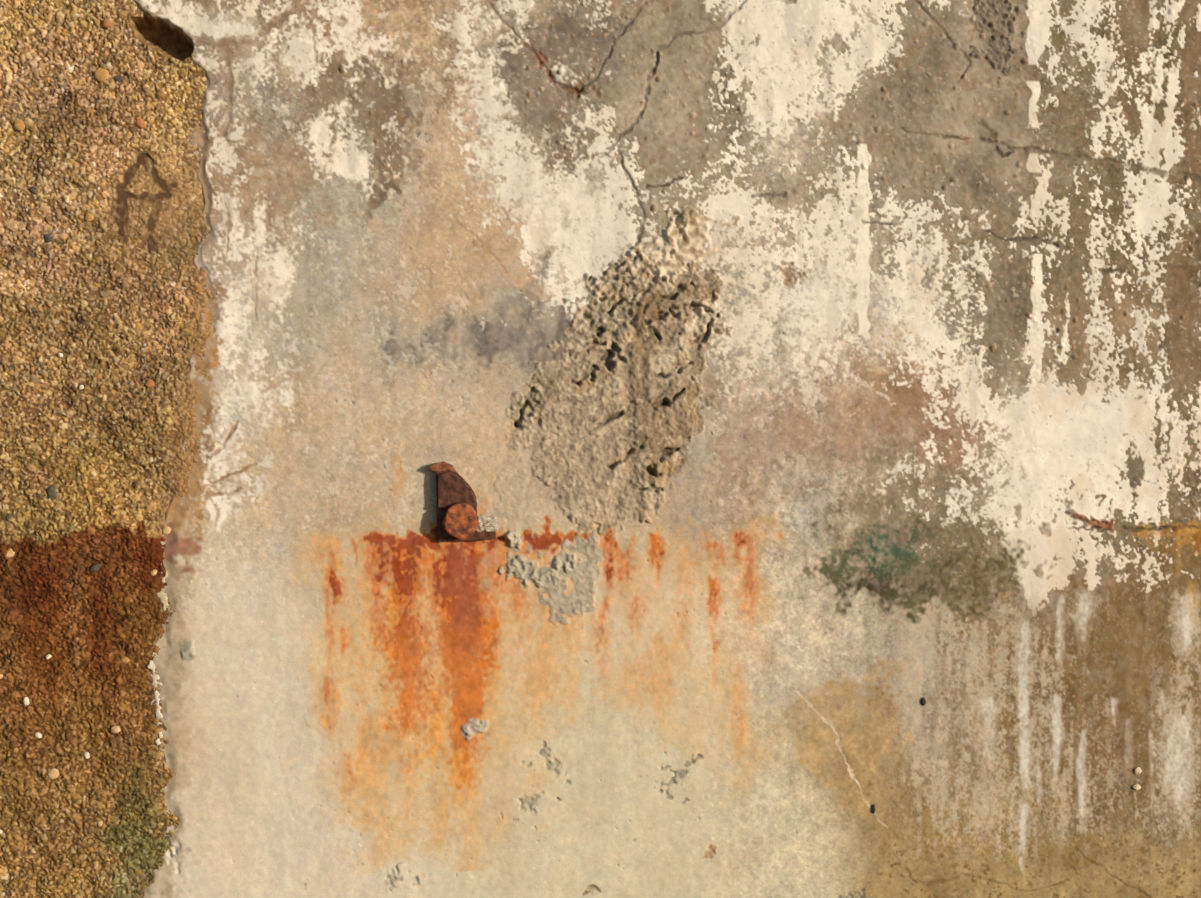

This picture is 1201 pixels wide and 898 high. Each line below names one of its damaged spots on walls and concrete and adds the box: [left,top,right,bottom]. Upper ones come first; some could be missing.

crack [477,0,654,97]
crack [615,0,798,246]
crack [900,117,1201,186]
crack [451,217,509,274]
spalling [0,0,1201,622]
rust [0,515,220,894]
rust [280,440,790,875]
water stain [781,537,1201,898]
spalling [0,854,120,898]
spalling [164,822,182,875]
spalling [383,861,430,892]